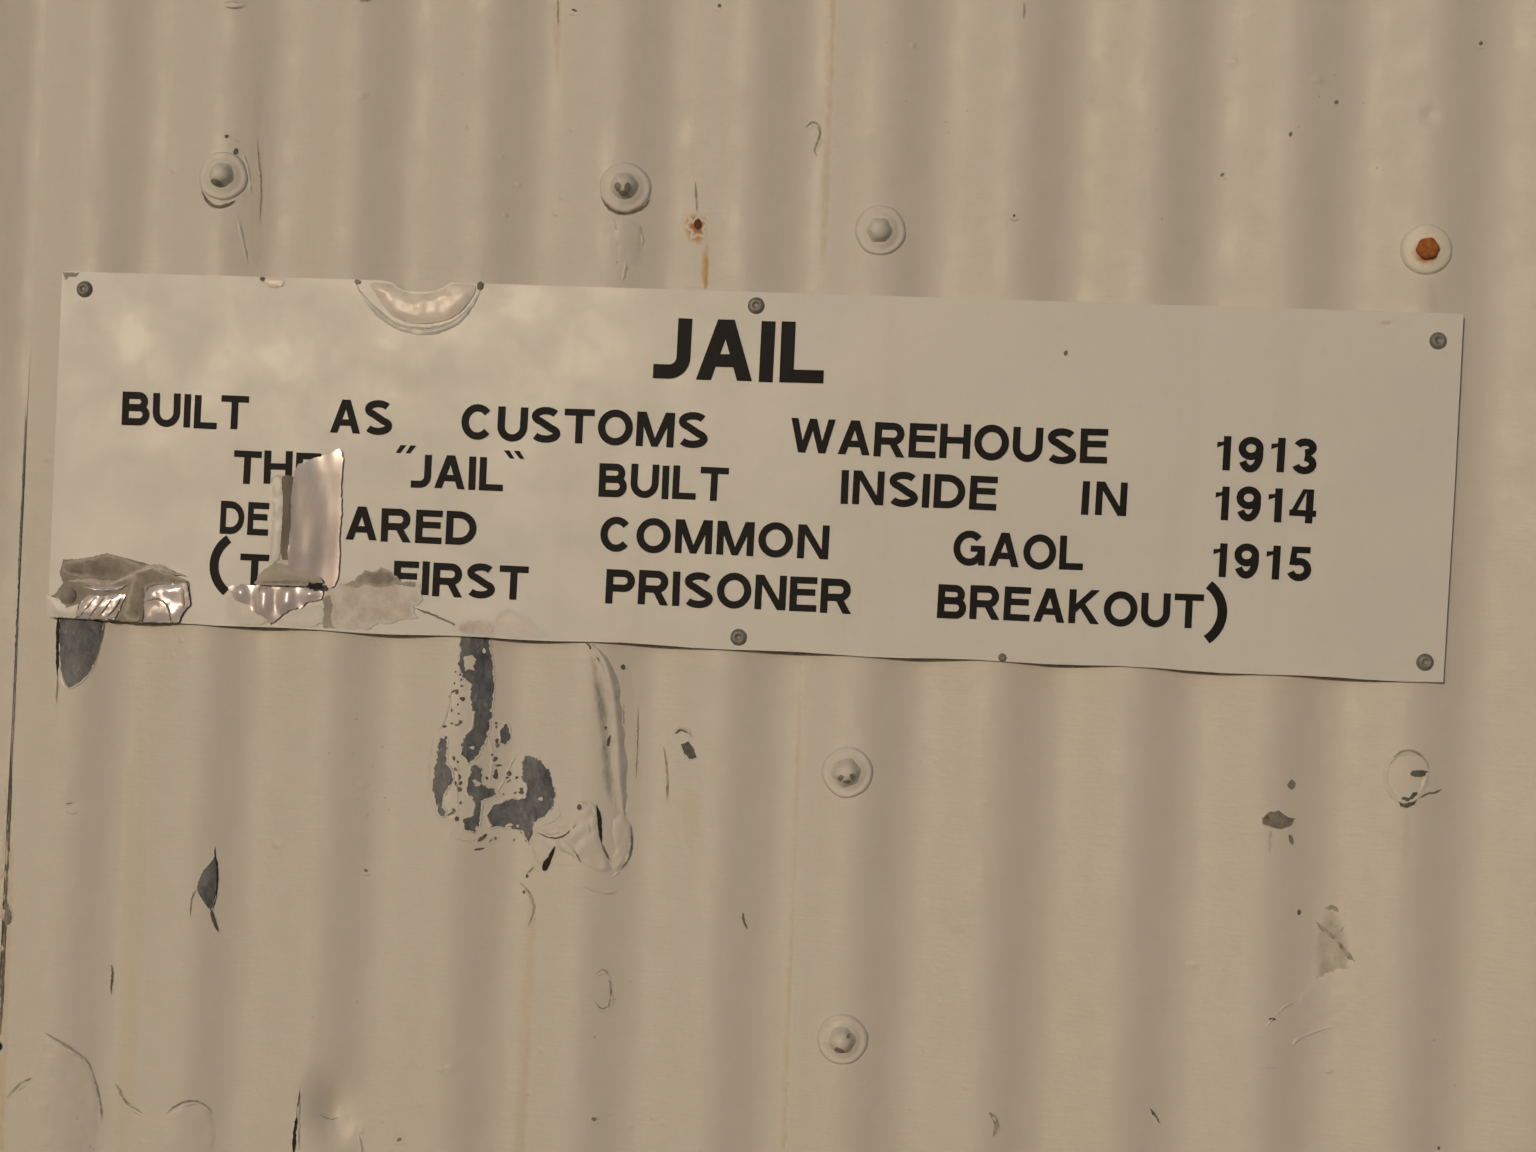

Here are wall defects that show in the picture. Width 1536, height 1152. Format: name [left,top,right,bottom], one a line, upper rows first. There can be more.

corrosion [1409,233,1443,313]
peeling [56,618,106,703]
peeling [427,636,639,895]
peeling [190,850,219,931]